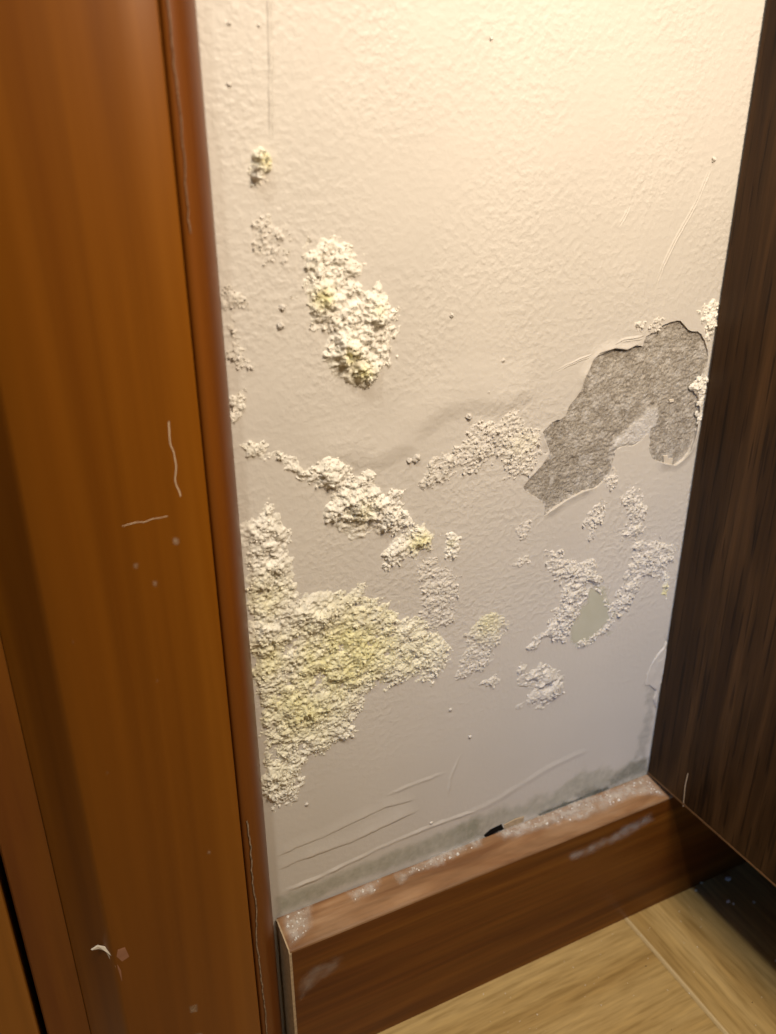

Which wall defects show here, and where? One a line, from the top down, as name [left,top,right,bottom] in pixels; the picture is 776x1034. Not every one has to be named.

water stain [247,146,273,187]
water stain [291,235,401,390]
peeling [520,321,707,521]
water stain [240,497,454,813]
water stain [573,592,610,641]